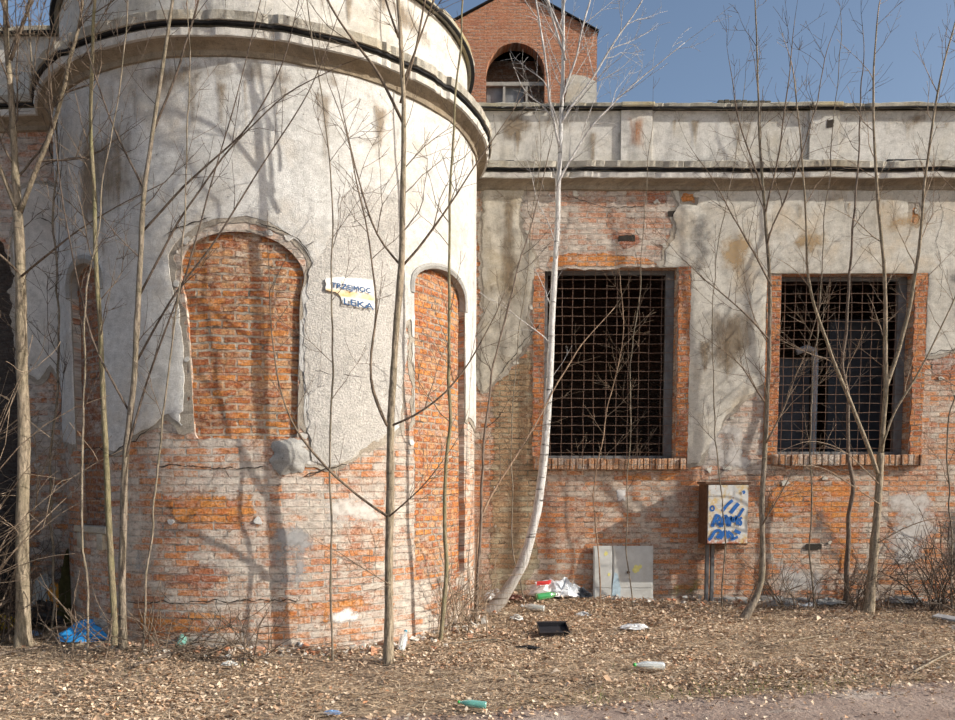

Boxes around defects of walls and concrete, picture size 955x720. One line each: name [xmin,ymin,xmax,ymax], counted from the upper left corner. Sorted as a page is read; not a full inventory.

leakage [149,68,193,95]
leakage [376,109,386,142]
leakage [81,129,120,221]
flaking render [522,190,700,271]
leakage [701,316,747,371]
flaking render [296,406,310,450]
flaking render [398,328,414,488]
crack [155,464,266,476]
flaking render [162,488,263,532]
spalling [161,561,245,590]
flaking render [138,610,254,639]
flaking render [279,593,375,629]